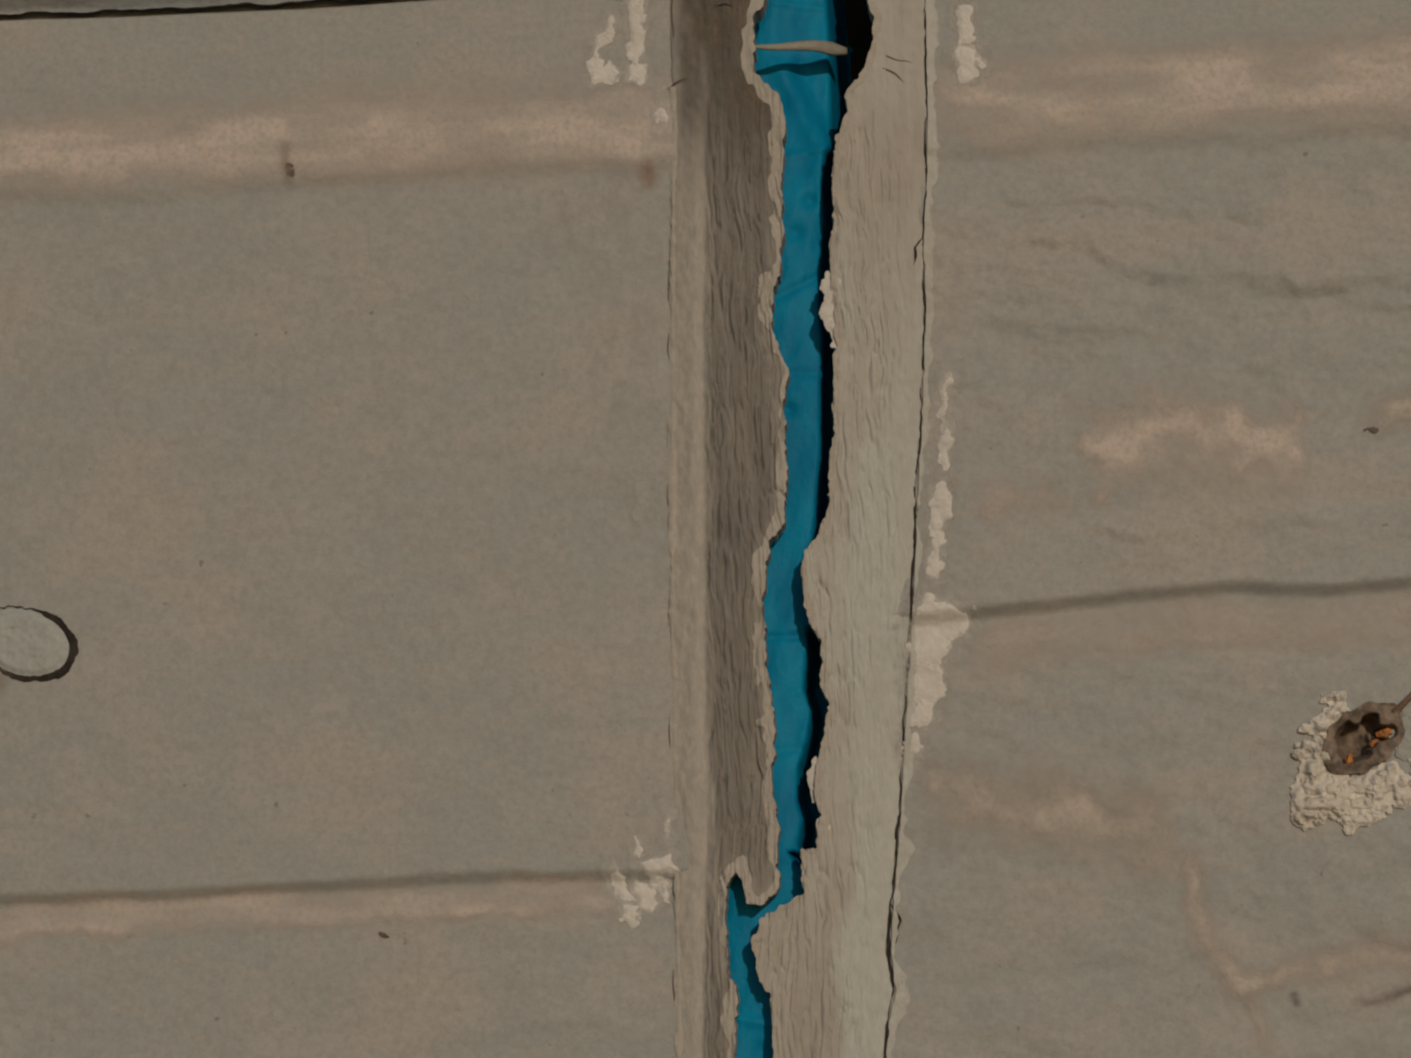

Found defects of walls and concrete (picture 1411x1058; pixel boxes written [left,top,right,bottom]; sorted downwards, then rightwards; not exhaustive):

crack [666,78,687,142]
crack [665,199,673,356]
crack [717,0,940,1058]
spalling [1322,701,1411,775]
crack [669,970,677,1001]